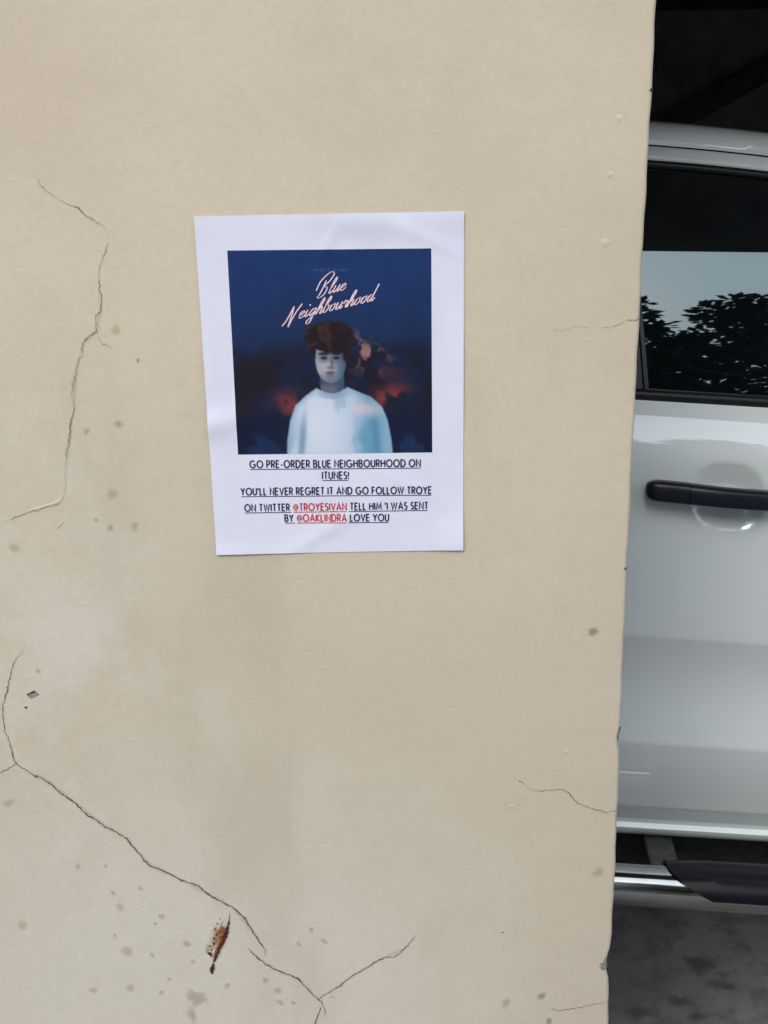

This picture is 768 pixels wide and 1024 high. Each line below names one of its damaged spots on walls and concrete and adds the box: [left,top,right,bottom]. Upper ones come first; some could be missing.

crack [42,186,108,458]
crack [0,658,415,1024]
corrosion [208,912,230,974]
crack [519,781,616,813]